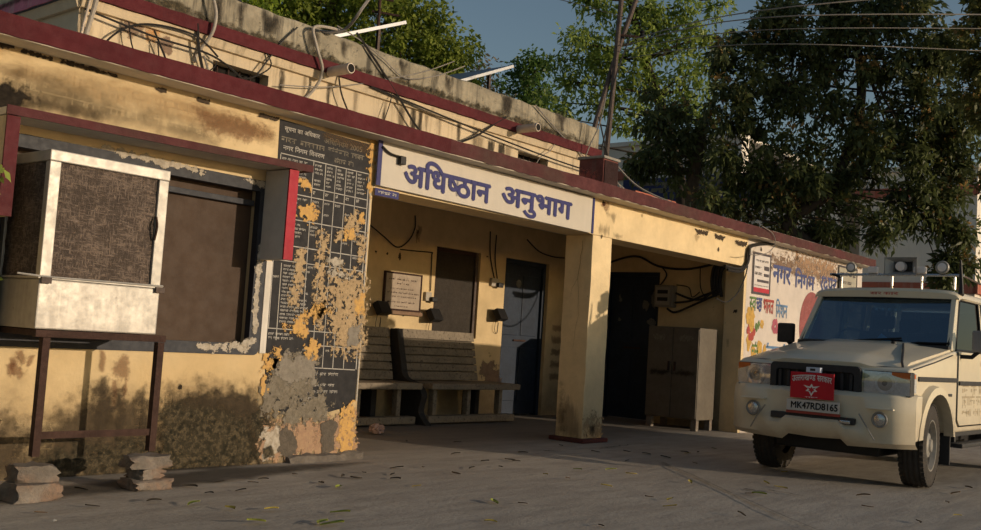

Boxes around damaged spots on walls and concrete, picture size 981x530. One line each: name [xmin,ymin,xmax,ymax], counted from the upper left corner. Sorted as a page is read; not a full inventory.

water stain [145,0,587,145]
peeling [101,144,206,176]
peeling [196,243,265,354]
peeling [255,178,401,464]
water stain [94,379,125,430]
water stain [157,385,342,487]
water stain [62,479,129,496]